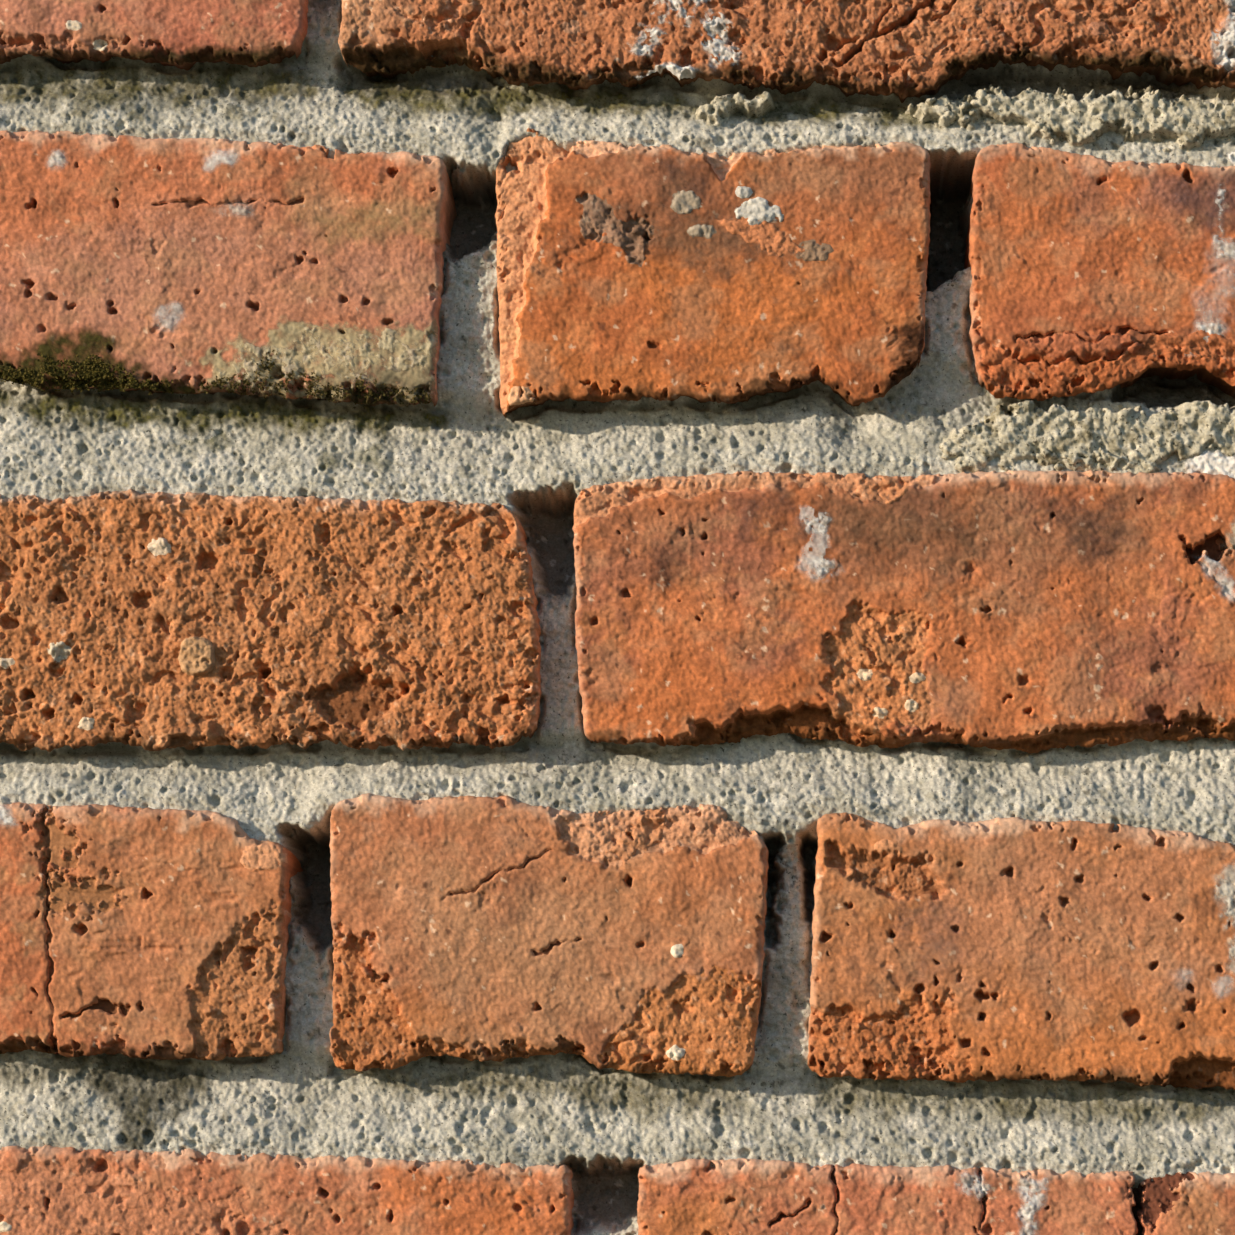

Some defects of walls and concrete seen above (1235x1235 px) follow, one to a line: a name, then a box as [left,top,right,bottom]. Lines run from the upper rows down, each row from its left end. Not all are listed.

water stain [631,0,740,80]
water stain [1211,0,1235,70]
water stain [0,331,196,394]
water stain [1197,323,1223,342]
crack [449,849,551,896]
crack [21,806,131,1049]
crack [533,939,582,956]
crack [769,1165,840,1235]
water stain [962,1174,989,1198]
crack [978,1168,987,1222]
water stain [1018,1176,1048,1235]
crack [1127,1172,1195,1235]